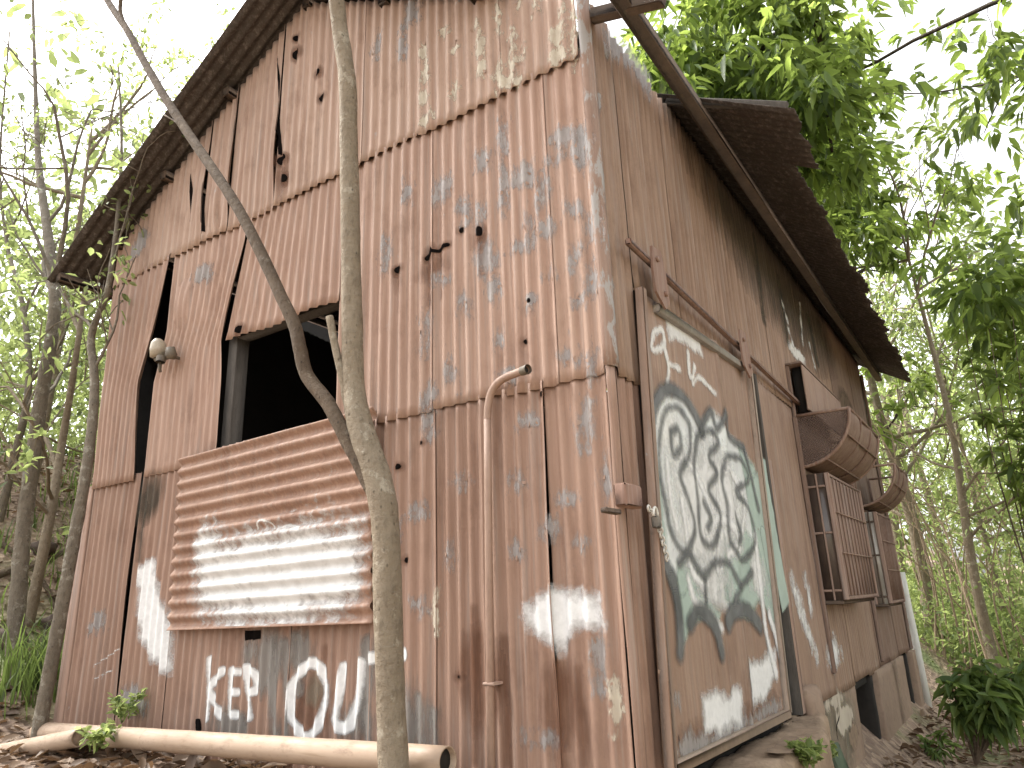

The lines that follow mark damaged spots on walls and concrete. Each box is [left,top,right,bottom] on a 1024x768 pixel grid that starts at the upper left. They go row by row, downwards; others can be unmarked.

peeling [398,0,435,128]
peeling [470,0,526,97]
peeling [548,0,580,74]
water stain [137,480,160,557]